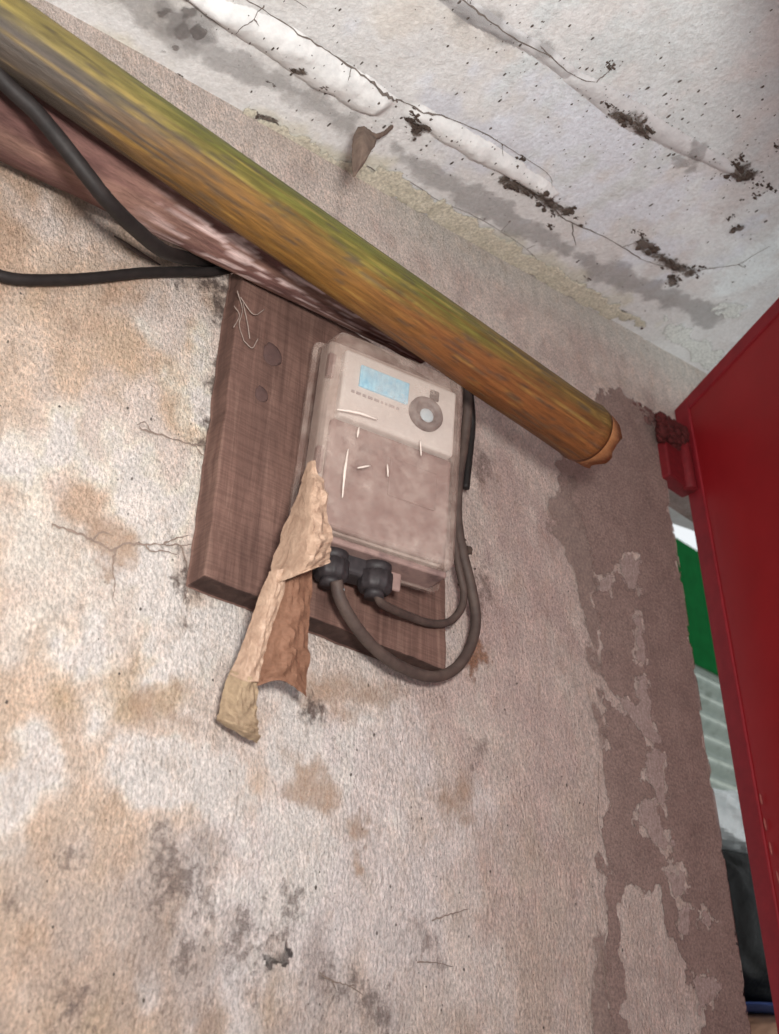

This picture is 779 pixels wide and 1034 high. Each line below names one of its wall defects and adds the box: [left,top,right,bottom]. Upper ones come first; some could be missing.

leakage [158,8,206,50]
crack [462,0,614,82]
crack [236,0,552,180]
crack [407,180,537,260]
crack [553,206,666,267]
crack [52,523,192,602]
peeling [617,616,667,806]